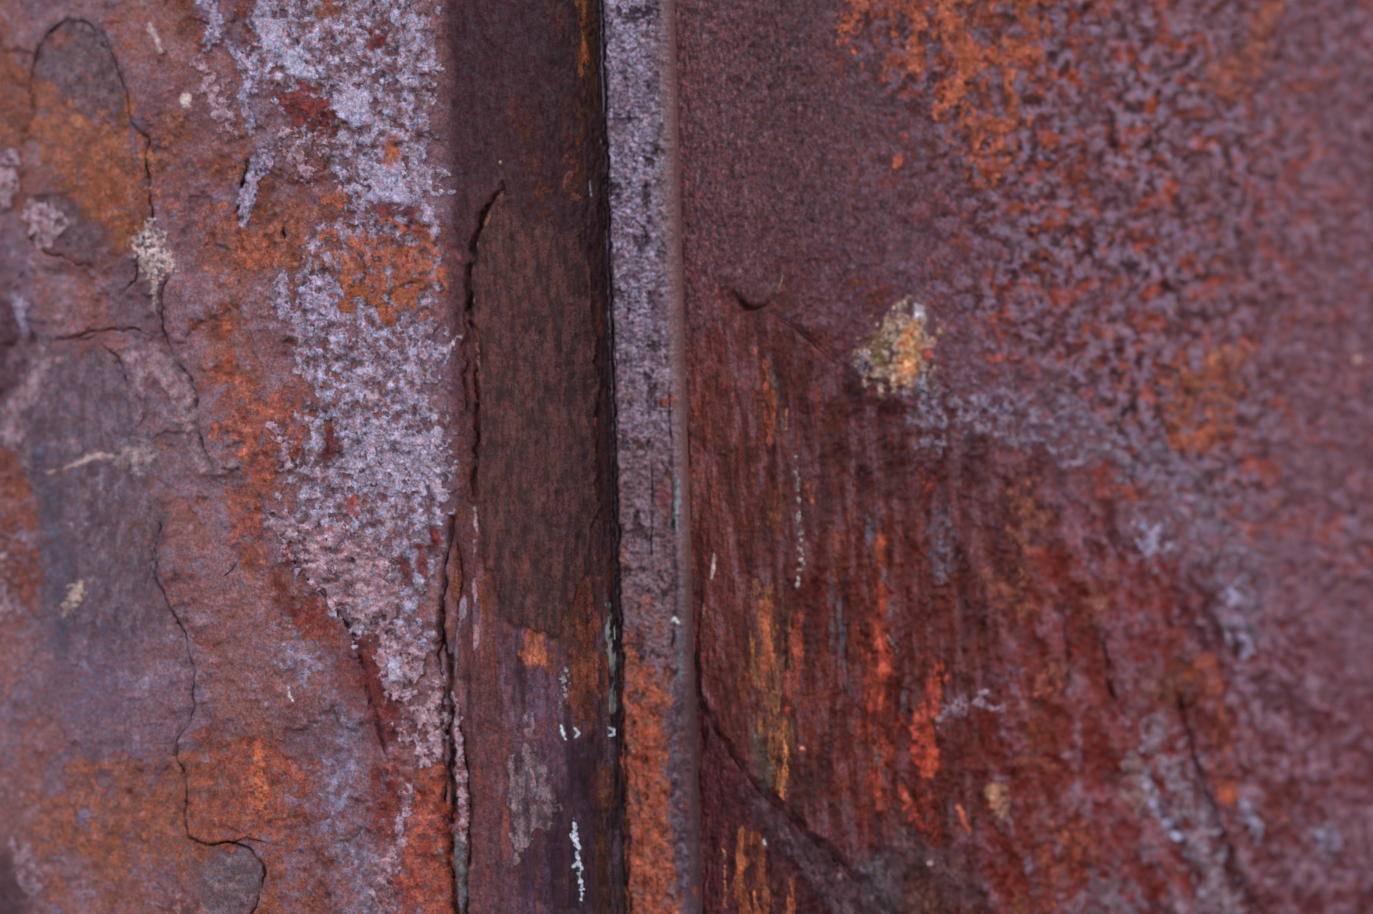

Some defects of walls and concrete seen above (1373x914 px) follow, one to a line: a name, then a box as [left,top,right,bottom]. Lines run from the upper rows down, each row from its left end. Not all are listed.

crack [28,20,218,478]
crack [145,524,266,914]
rust [0,37,460,914]
crack [237,164,249,221]
crack [294,561,385,751]
crack [437,536,472,914]
crack [461,187,503,493]
rust [522,555,696,914]
rust [721,819,796,914]
rust [737,347,815,800]
rust [812,529,1056,846]
rust [824,0,1102,212]